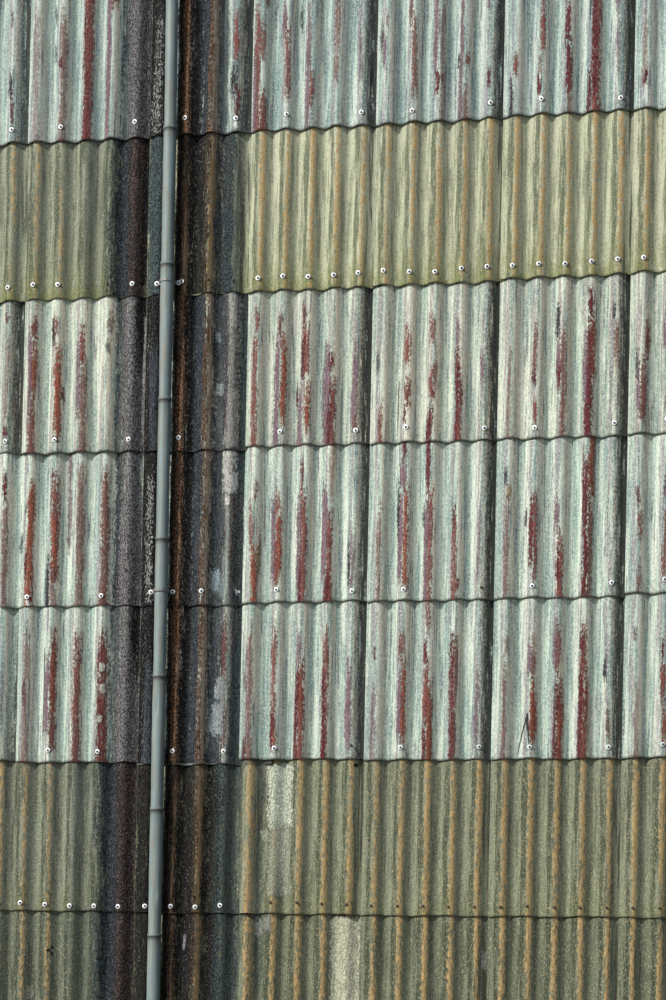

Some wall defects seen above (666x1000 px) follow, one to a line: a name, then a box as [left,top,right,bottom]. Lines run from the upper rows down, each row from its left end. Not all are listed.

rust [82,0,119,140]
rust [586,0,621,112]
rust [1,473,36,607]
rust [45,317,87,607]
water stain [92,0,166,1000]
water stain [160,0,248,1000]
rust [295,458,308,602]
rust [421,313,438,760]
rust [581,287,596,597]
rust [94,628,110,762]
rust [551,618,564,759]
rust [576,622,589,758]